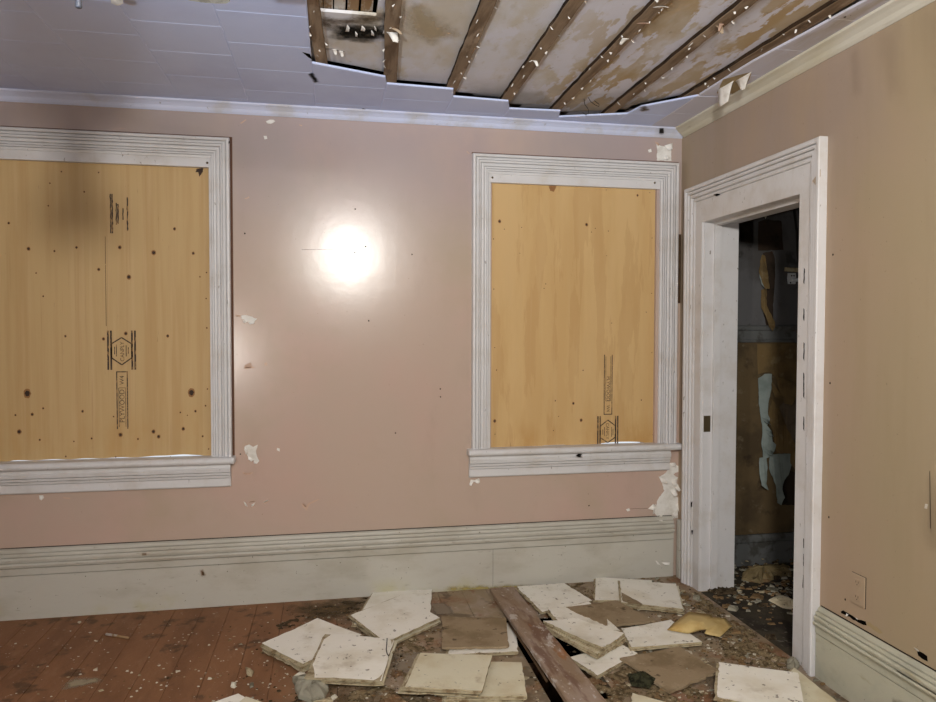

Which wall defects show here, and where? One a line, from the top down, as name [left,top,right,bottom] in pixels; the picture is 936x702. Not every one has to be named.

peeling [717,72,751,106]
peeling [244,445,259,464]
peeling [648,463,681,521]